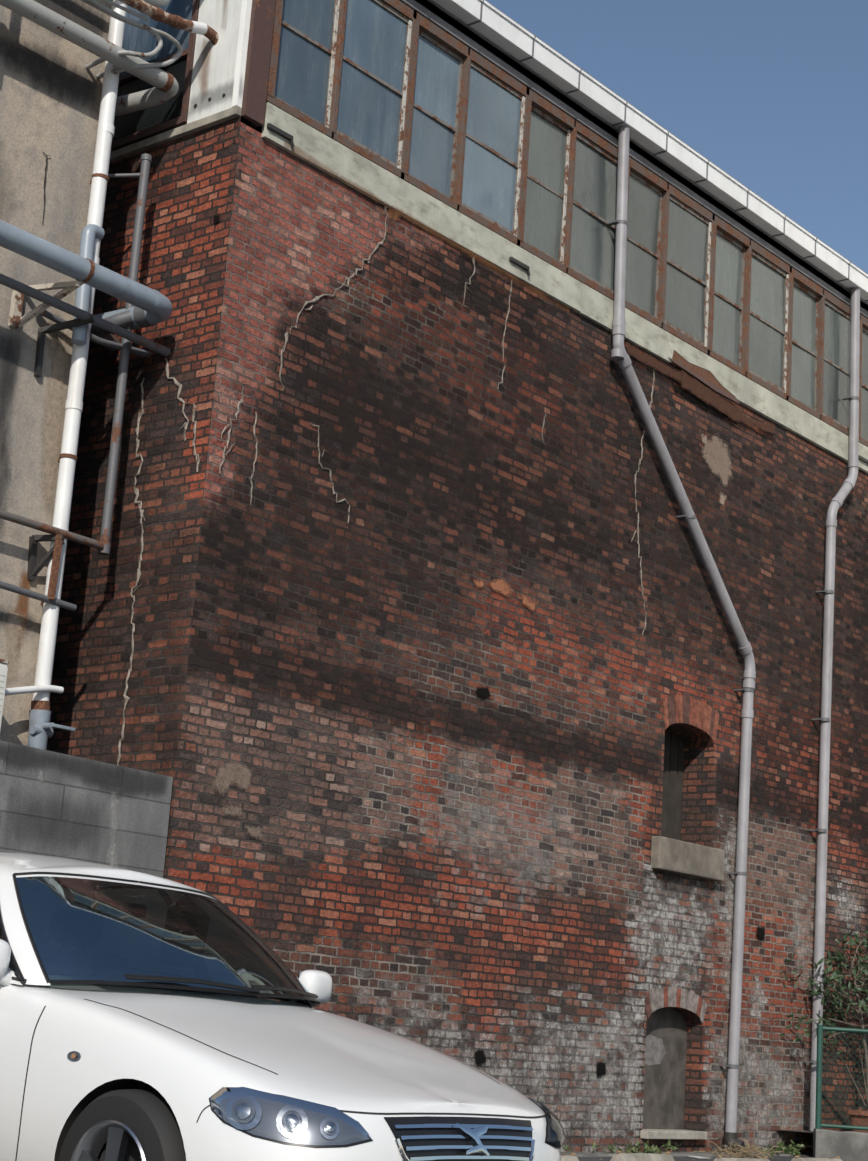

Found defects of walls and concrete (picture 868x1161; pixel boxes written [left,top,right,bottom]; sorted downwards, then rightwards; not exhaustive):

crack [279,205,387,390]
crack [498,280,512,388]
crack [310,422,350,523]
crack [631,368,655,635]
spalling [702,433,731,506]
crack [117,357,258,765]
leakage [61,760,163,793]
leakage [376,823,737,1152]
leakage [750,976,768,1017]
leakage [702,1037,809,1152]